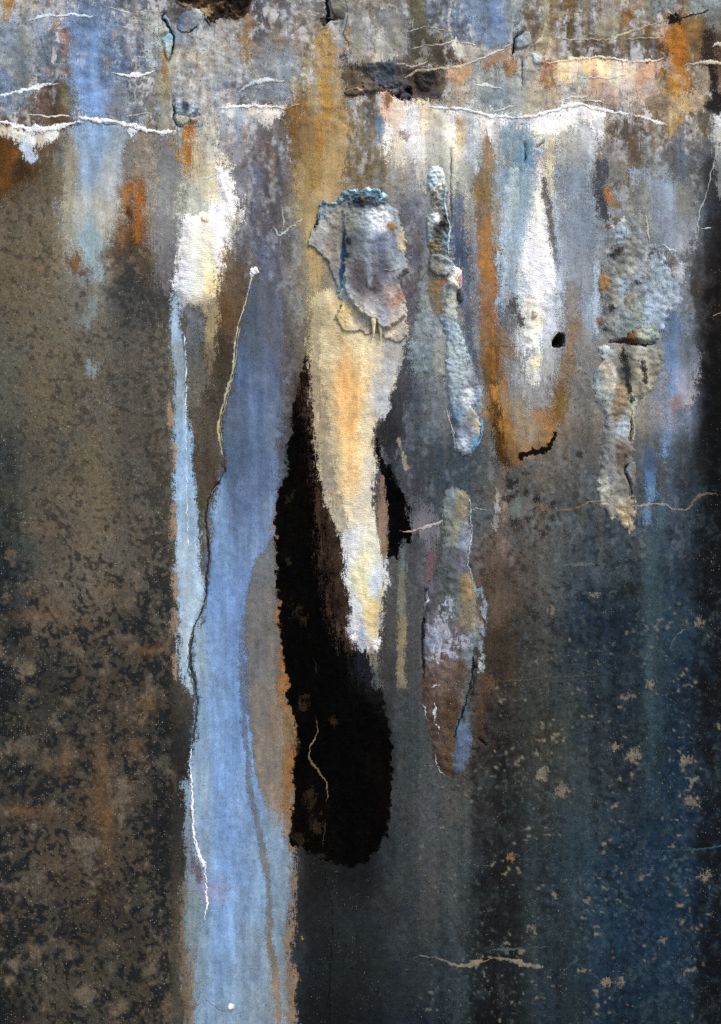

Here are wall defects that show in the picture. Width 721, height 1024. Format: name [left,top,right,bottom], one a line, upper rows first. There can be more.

crack [0,83,177,164]
rust [279,23,358,319]
spalling [338,50,449,105]
rust [656,12,708,140]
rust [470,133,584,685]
damp [0,0,301,1024]
crack [553,492,719,527]
crack [187,277,252,918]
crack [415,946,547,995]